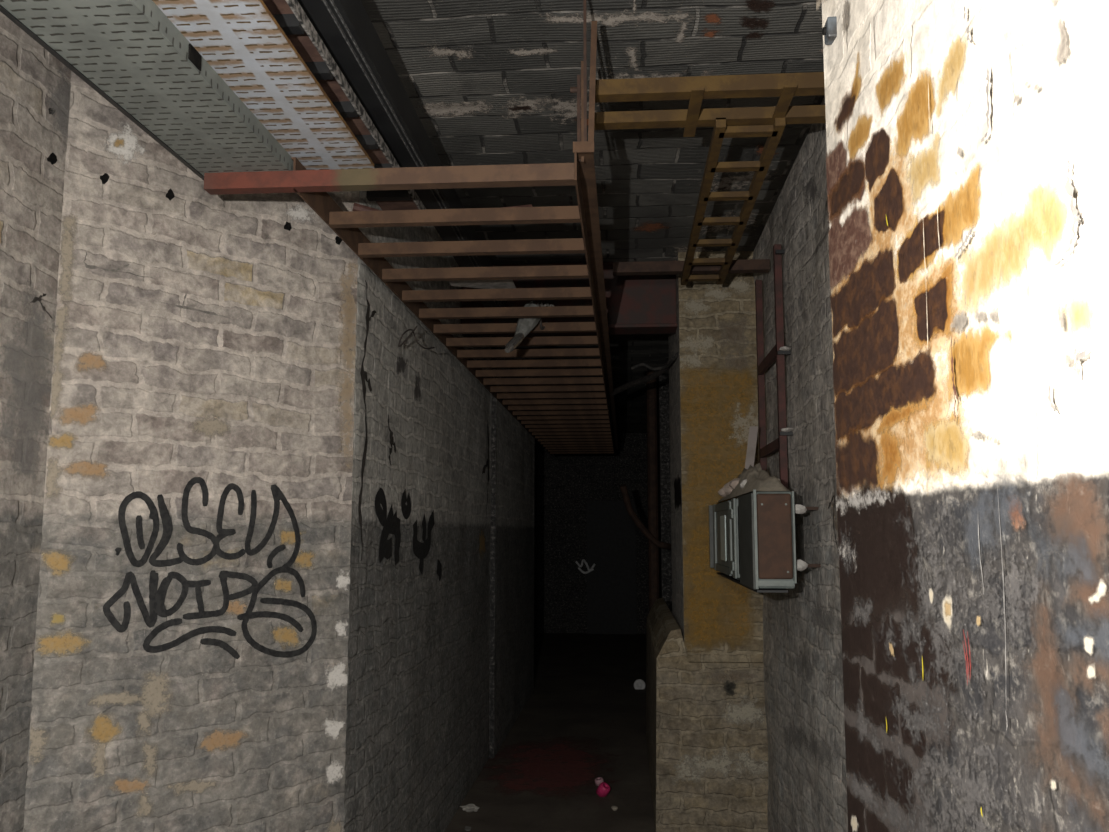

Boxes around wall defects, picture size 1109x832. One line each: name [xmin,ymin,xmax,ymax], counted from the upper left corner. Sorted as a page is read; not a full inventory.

peeling [950,308,997,333]